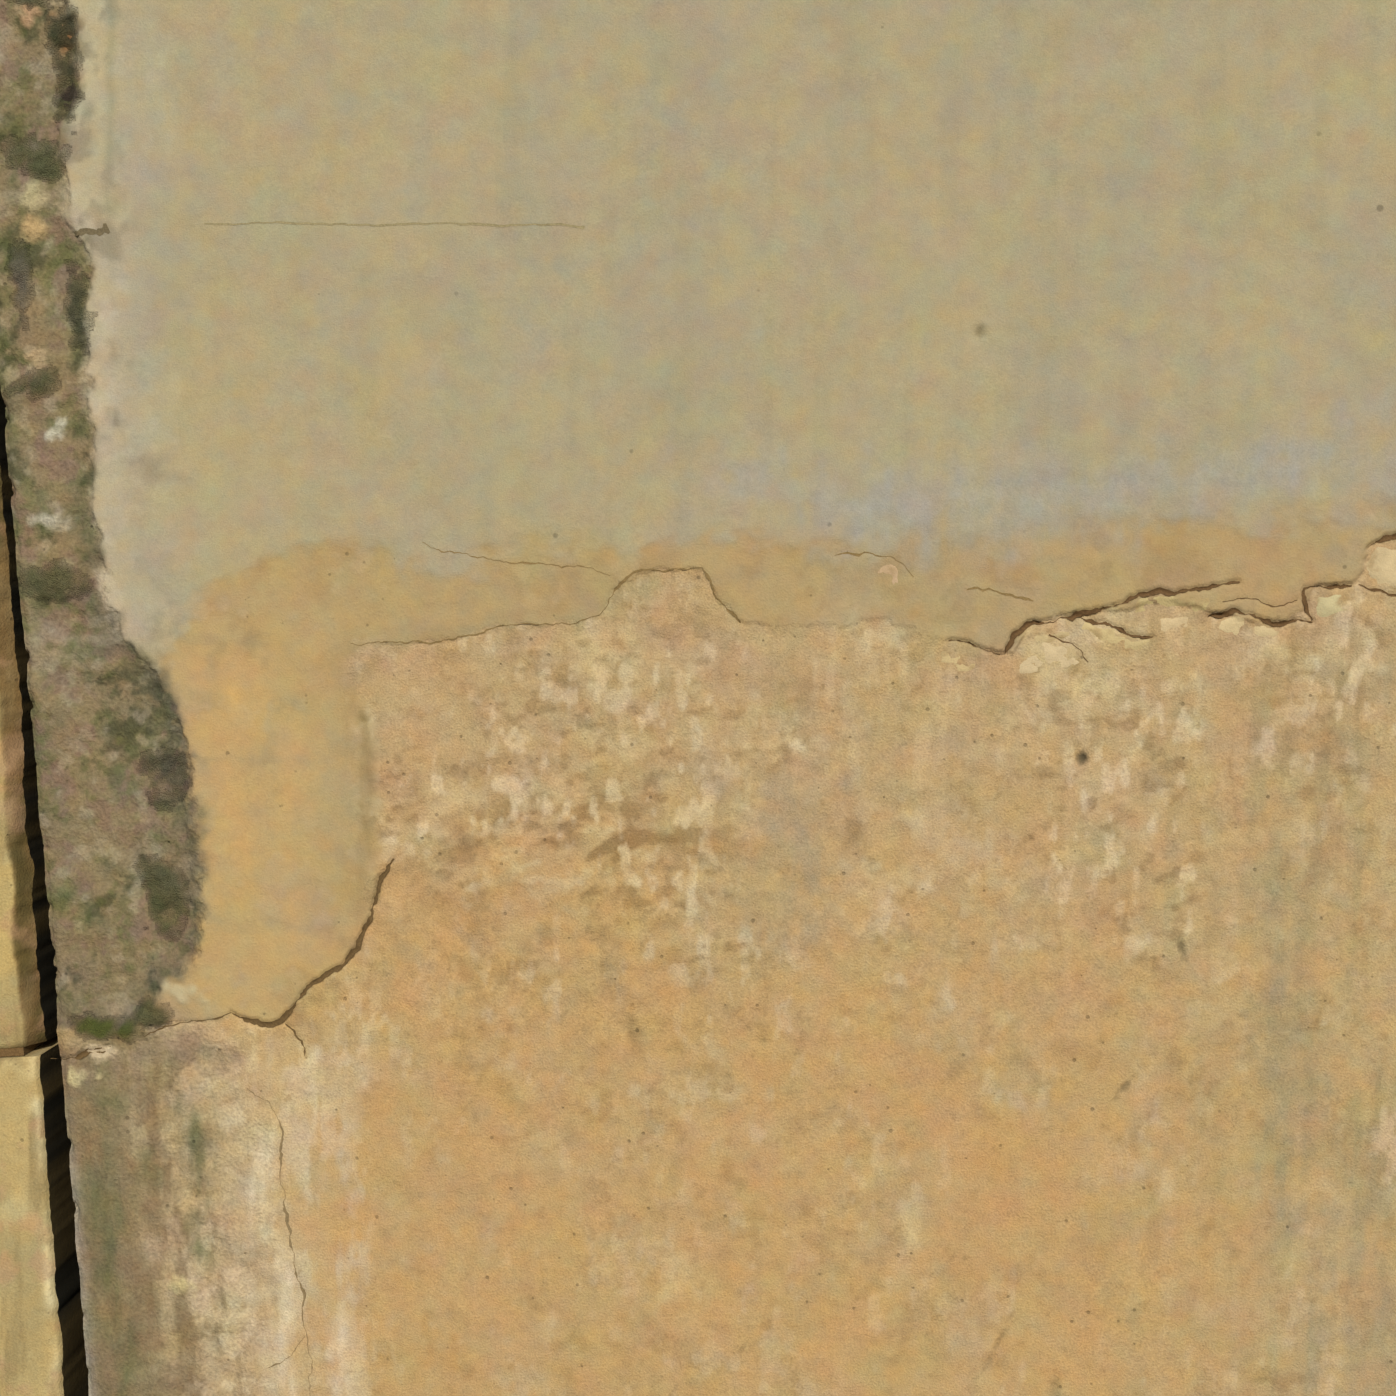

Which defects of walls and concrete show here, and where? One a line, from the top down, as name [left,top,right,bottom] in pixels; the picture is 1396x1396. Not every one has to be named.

peeling [1366,547,1396,588]
peeling [1316,595,1347,617]
peeling [1019,594,1210,674]
peeling [1219,616,1279,637]
spalling [1073,748,1092,770]
crack [144,858,394,1058]
spalling [1174,936,1189,965]
crack [51,1046,111,1060]